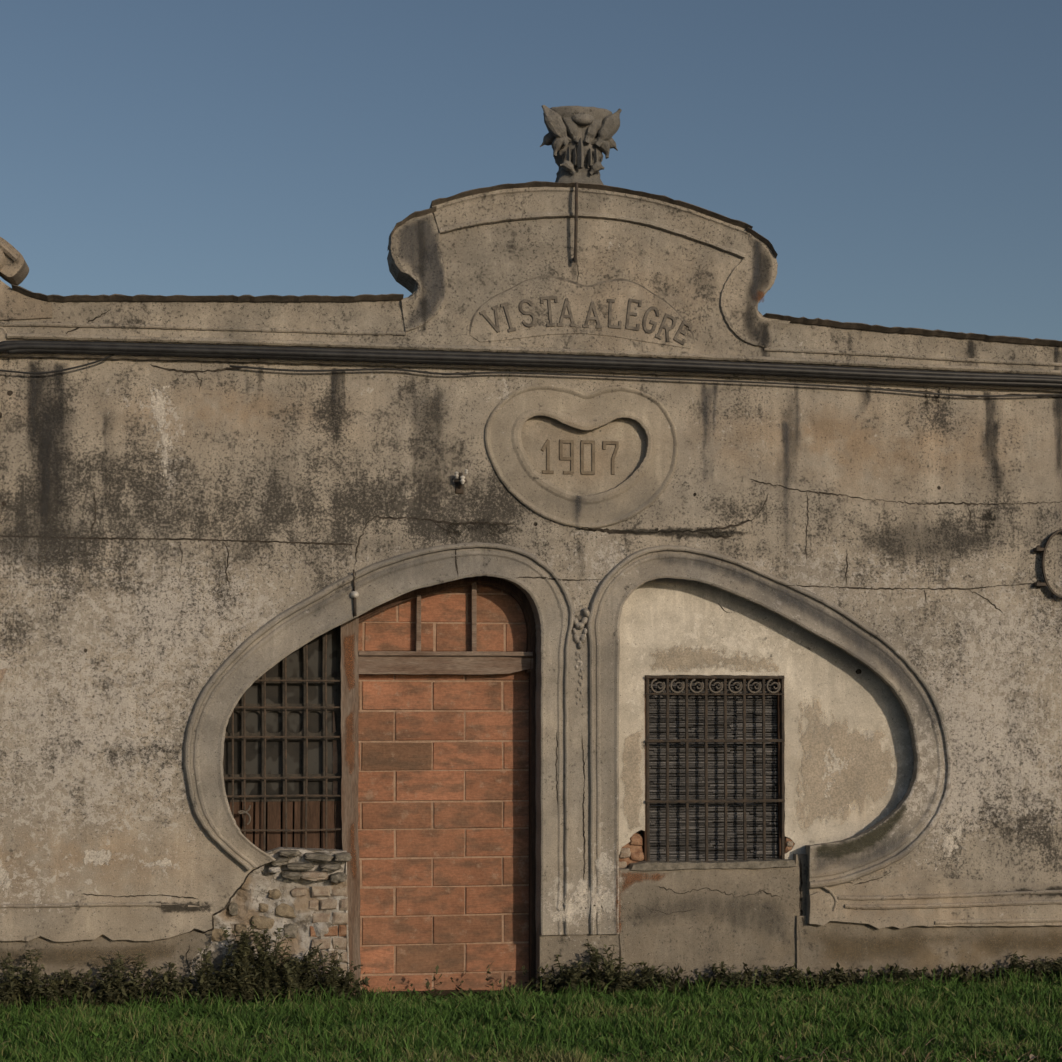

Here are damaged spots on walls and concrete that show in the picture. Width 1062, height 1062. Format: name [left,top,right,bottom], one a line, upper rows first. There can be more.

water stain [400,221,443,331]
water stain [746,243,769,363]
water stain [332,368,345,396]
water stain [30,363,64,525]
water stain [985,393,1001,483]
crack [0,489,514,591]
crack [577,526,661,534]
crack [687,479,1062,559]
crack [787,551,1036,612]
water stain [980,511,996,531]
peeling [552,733,644,923]
spalling [182,825,356,1000]